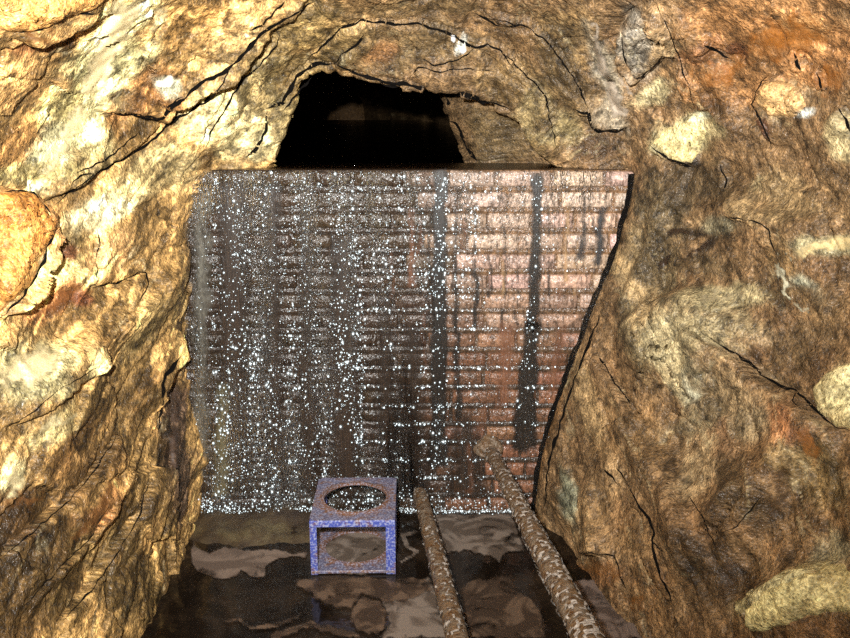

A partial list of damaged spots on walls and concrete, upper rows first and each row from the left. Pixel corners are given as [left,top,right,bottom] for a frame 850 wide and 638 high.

damp [373,170,607,638]